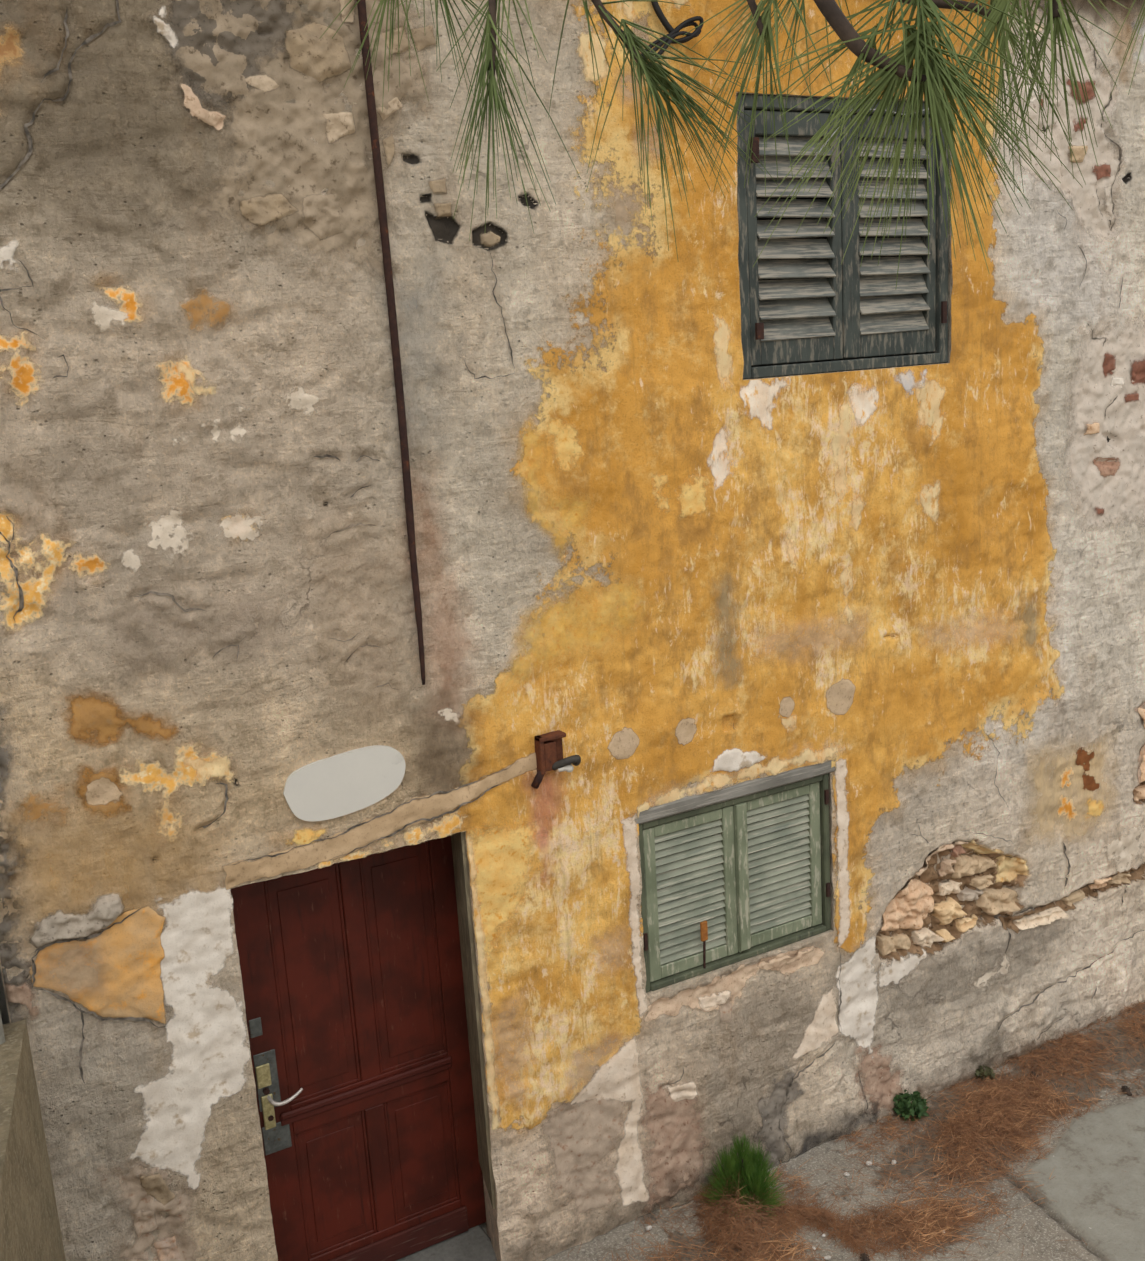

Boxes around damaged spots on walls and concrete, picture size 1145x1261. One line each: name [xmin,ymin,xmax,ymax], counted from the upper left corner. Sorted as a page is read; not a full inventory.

crack [0,0,121,189]
spalling [154,0,436,276]
peeling [0,331,41,406]
crack [0,259,69,378]
peeling [92,286,142,332]
peeling [0,510,193,629]
peeling [318,0,1145,1217]
peeling [68,695,233,842]
crack [233,761,518,865]
crack [978,843,1094,953]
peeling [0,793,250,1261]
crack [984,930,1144,1048]